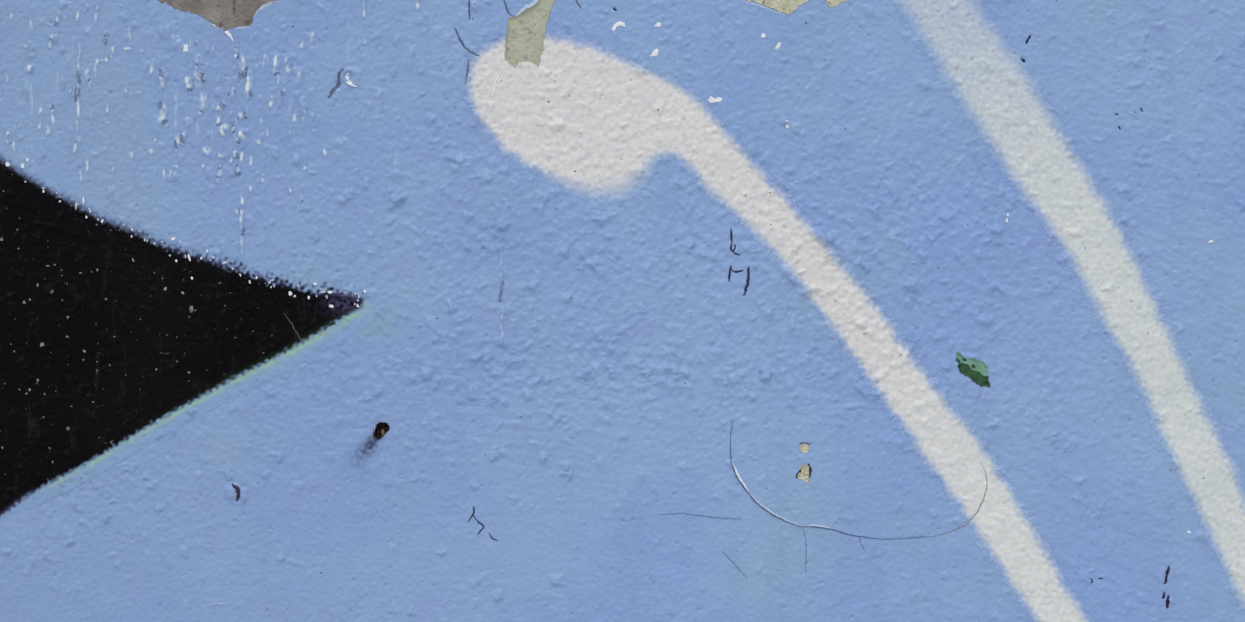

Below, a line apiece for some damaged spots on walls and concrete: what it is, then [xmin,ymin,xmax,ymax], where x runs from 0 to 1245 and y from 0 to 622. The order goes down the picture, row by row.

peeling [159,0,276,40]
peeling [742,0,809,16]
peeling [491,0,555,108]